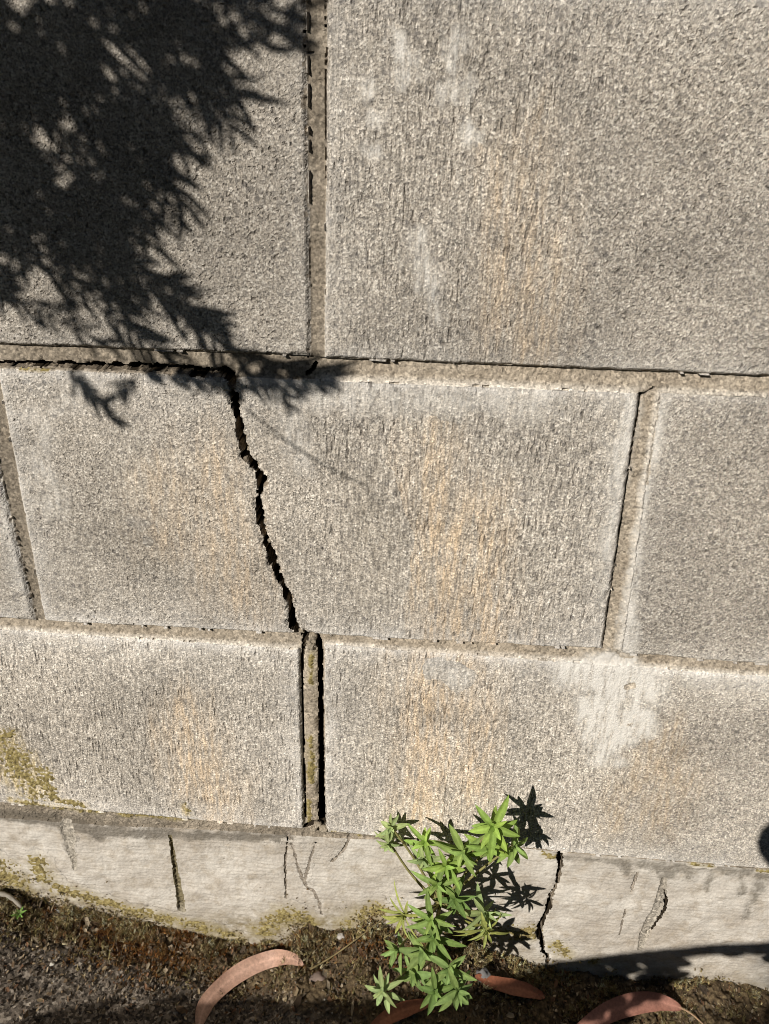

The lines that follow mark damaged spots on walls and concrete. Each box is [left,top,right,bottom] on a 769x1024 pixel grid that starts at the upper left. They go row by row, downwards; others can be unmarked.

crack [0,359,351,915]
crack [535,851,564,964]